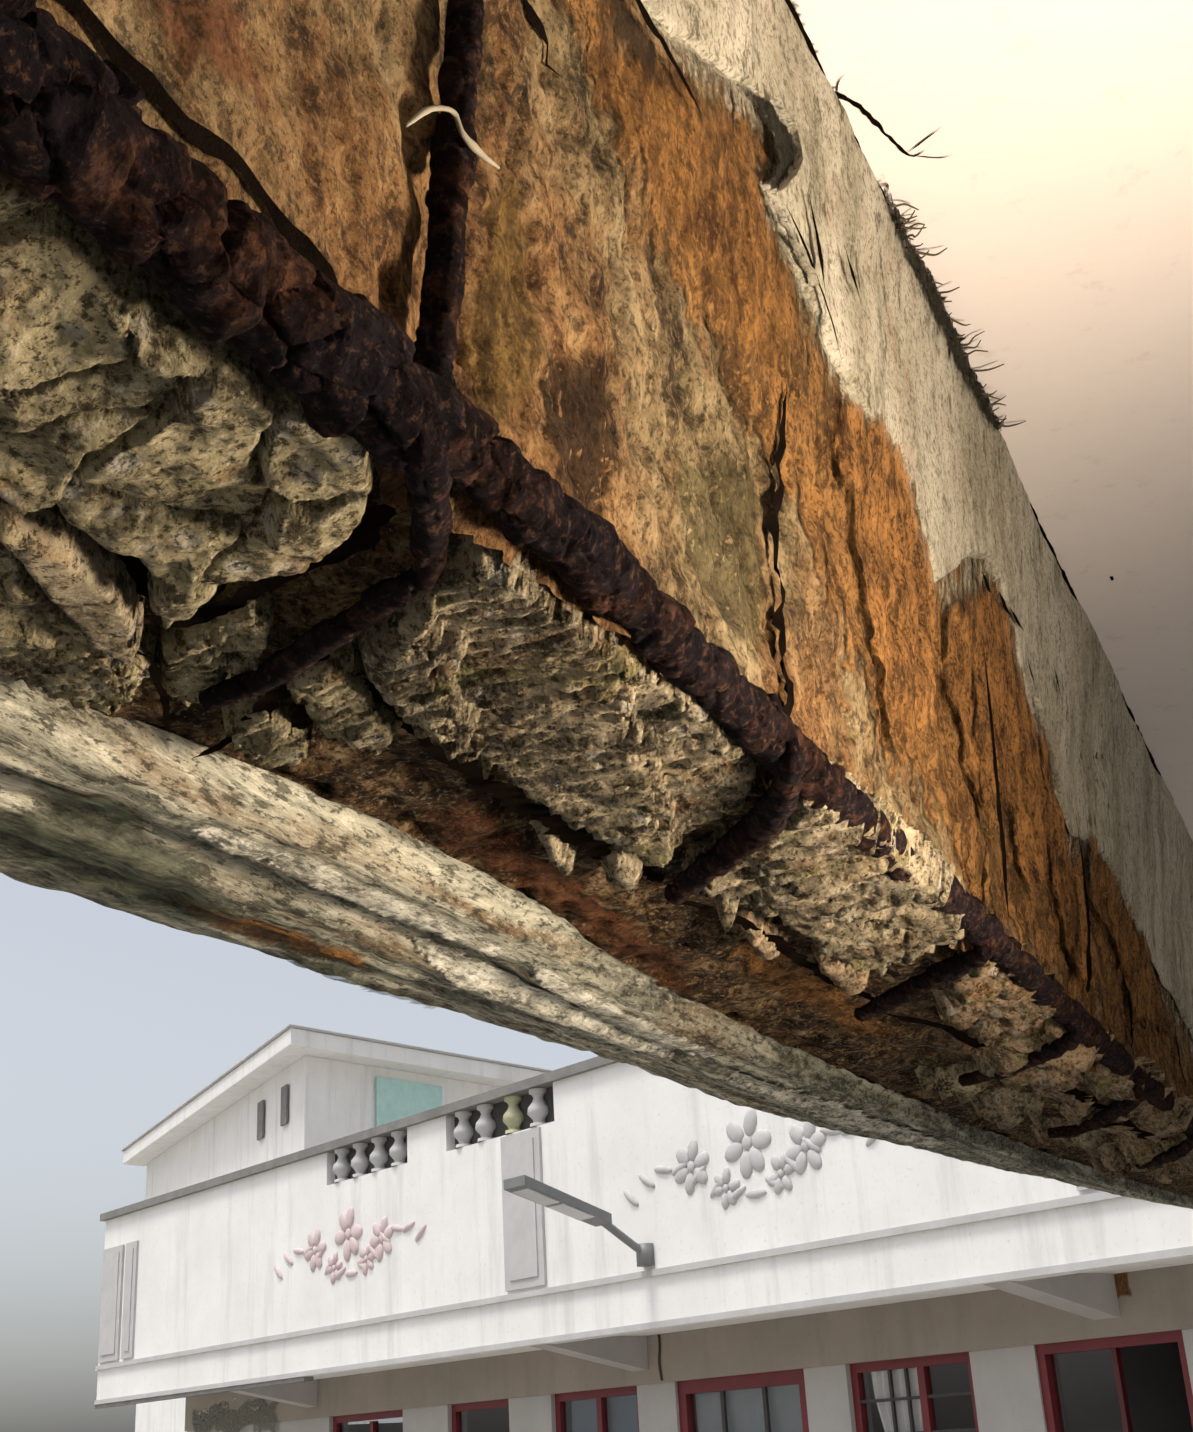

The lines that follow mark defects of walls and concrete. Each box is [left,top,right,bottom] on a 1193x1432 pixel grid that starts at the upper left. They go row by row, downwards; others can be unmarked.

crack [56,0,338,284]
crack [785,0,952,207]
spalling [0,170,374,715]
spalling [222,534,756,890]
rust [465,175,546,435]
crack [765,376,794,716]
rust [558,0,1193,1103]
peeling [641,0,1193,1060]
crack [1030,503,1078,601]
rust [178,893,368,968]
rust [428,802,692,995]
peeling [185,825,951,1148]